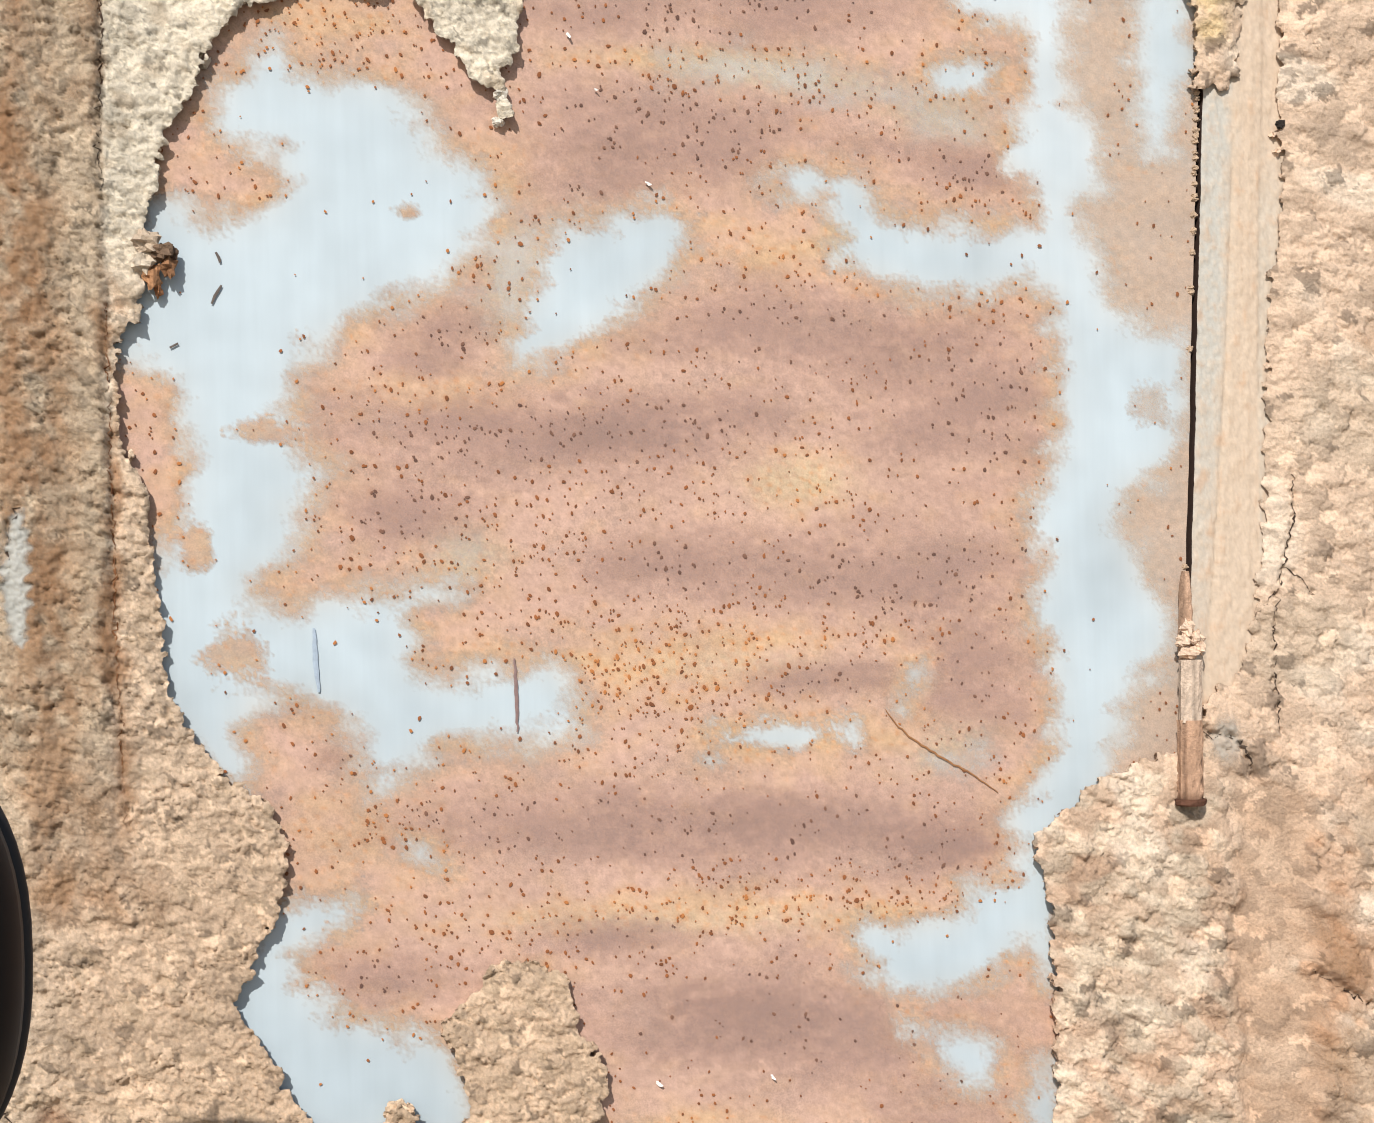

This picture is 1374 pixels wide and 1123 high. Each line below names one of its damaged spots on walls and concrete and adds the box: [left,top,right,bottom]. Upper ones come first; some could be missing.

flaking render [194,1,275,86]
flaking render [1186,2,1241,92]
corrosion [1069,0,1198,380]
flaking render [113,193,179,400]
corrosion [112,359,217,571]
corrosion [155,0,1069,1123]
corrosion [1118,418,1190,621]
crack [1256,474,1315,729]
corrosion [1113,655,1179,773]
flaking render [1032,751,1177,1122]
crack [1314,969,1369,1005]
flaking render [383,1098,420,1123]